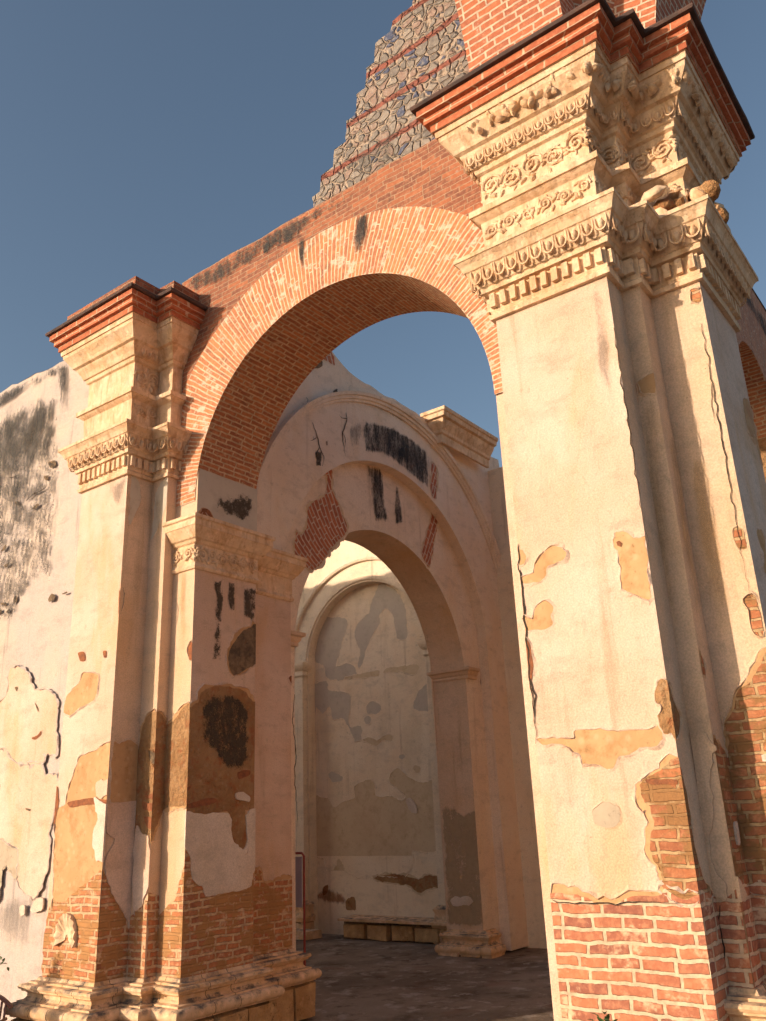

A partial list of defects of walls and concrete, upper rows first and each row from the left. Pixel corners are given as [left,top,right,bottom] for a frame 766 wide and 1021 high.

water stain [354,215,367,249]
water stain [0,400,51,521]
water stain [217,495,252,520]
flaking render [291,469,350,573]
water stain [365,423,428,484]
spalling [518,541,570,588]
crack [614,329,649,542]
spalling [611,528,654,606]
crack [701,325,750,596]
water stain [203,696,249,769]
flaking render [0,619,292,983]
flaking render [536,591,766,1021]